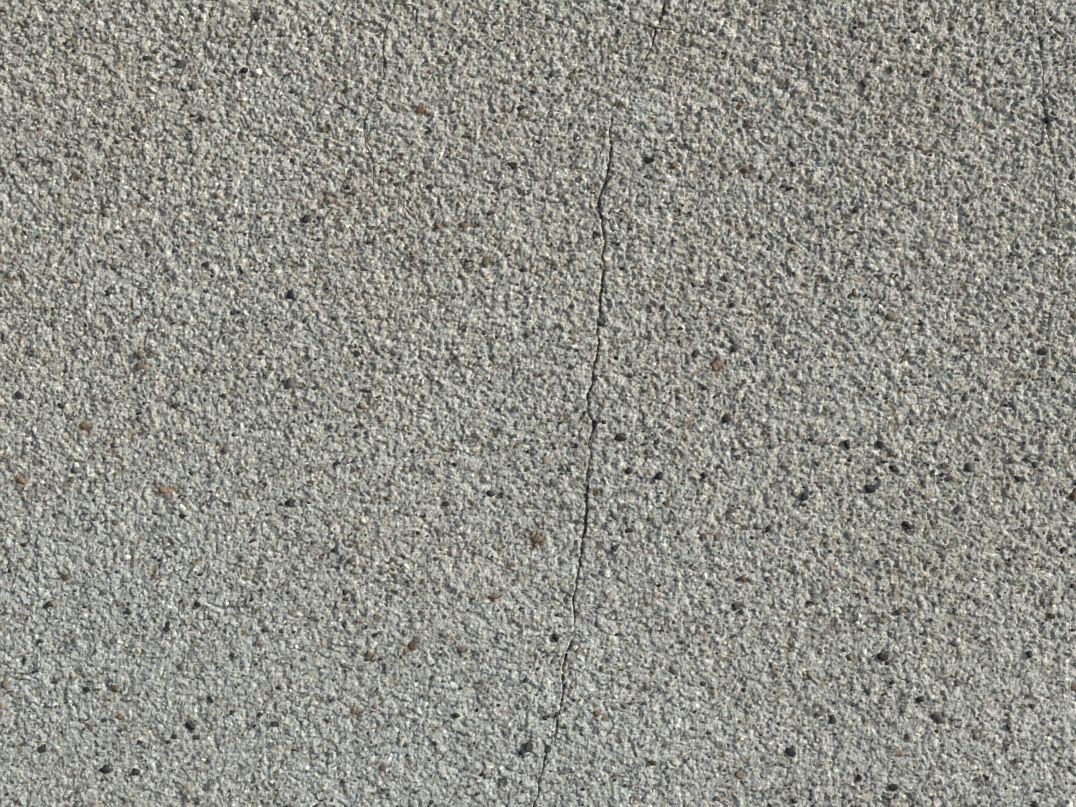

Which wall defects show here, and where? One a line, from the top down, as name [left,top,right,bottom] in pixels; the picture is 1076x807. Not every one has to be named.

crack [533,0,689,807]